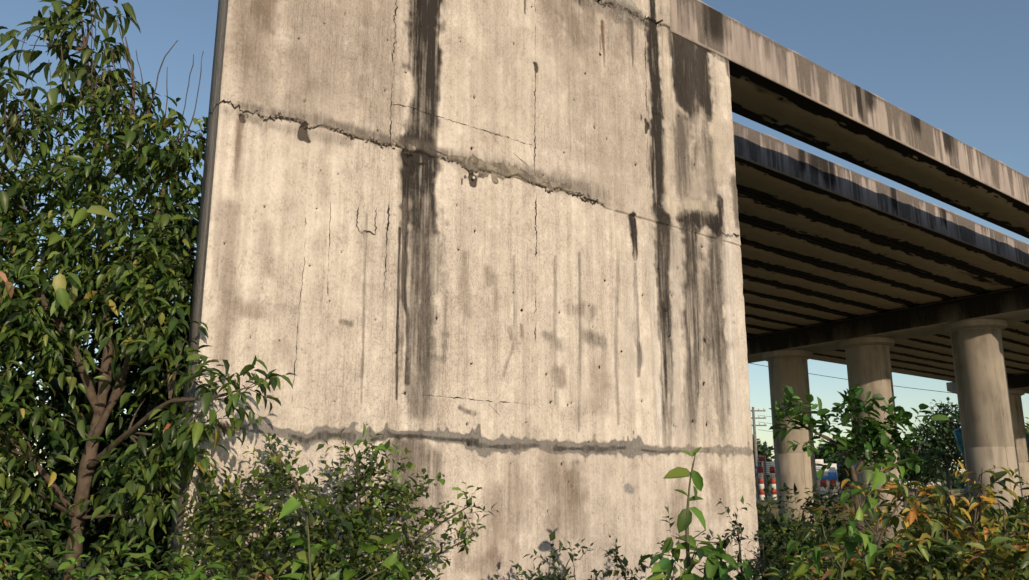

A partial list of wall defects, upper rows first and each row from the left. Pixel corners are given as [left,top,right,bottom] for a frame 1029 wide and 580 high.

damp [331,0,448,400]
crack [208,0,605,339]
peeling [596,0,646,31]
damp [627,0,1029,451]